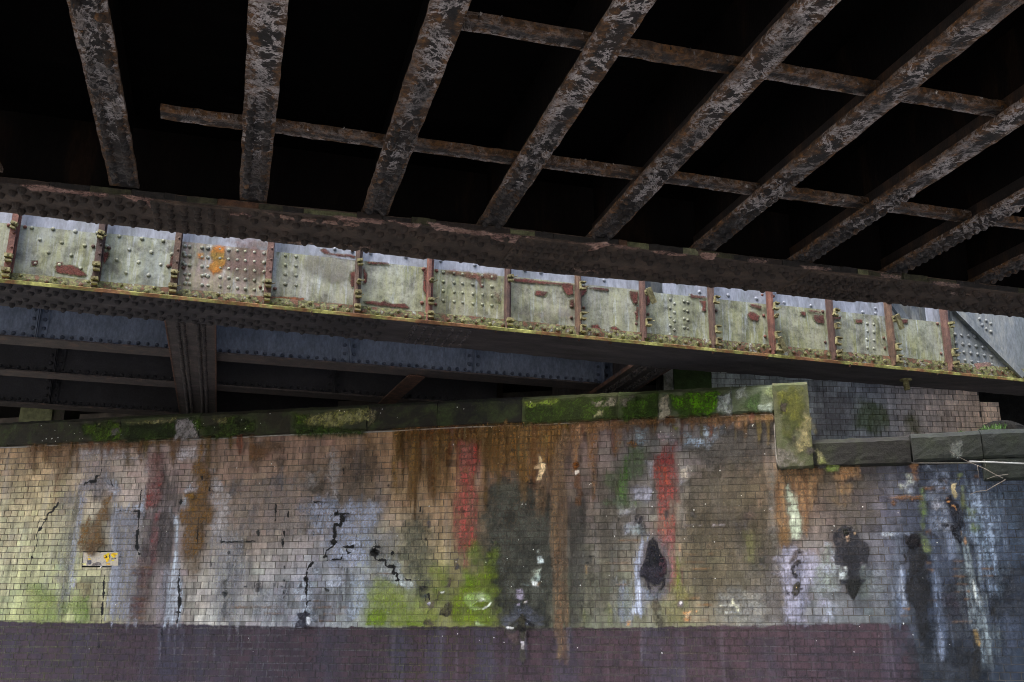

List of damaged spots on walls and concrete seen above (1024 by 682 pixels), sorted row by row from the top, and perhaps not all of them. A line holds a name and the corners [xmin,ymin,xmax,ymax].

corrosion [198,246,226,273]
crack [31,502,59,559]
crack [179,499,256,544]
water stain [210,478,245,626]
crack [275,503,289,545]
water stain [255,454,448,625]
crack [303,501,430,613]
corrosion [391,411,773,663]
water stain [453,417,1024,682]
corrosion [774,467,820,548]
corrosion [835,465,859,494]